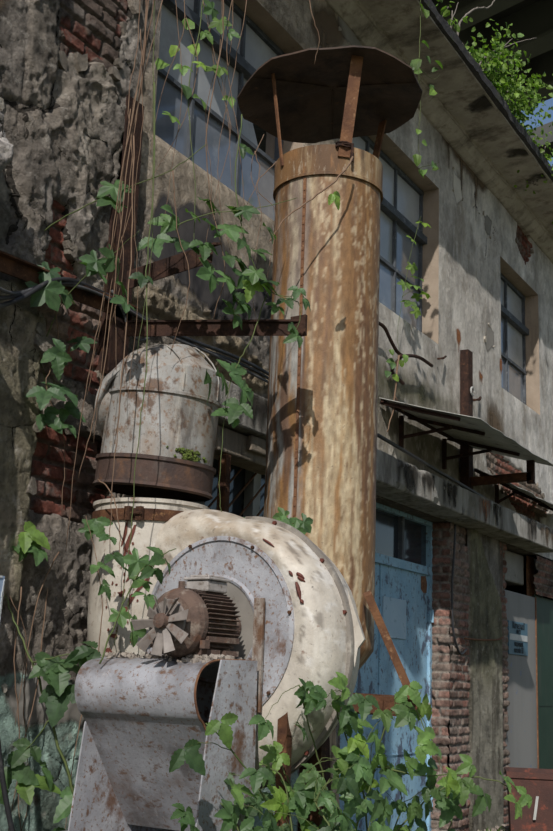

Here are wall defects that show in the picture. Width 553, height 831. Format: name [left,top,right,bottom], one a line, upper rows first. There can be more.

spalling [58,0,142,82]
damp [468,96,493,112]
crack [3,134,122,251]
damp [442,136,487,208]
damp [506,149,529,158]
spalling [515,225,534,265]
spalling [33,294,107,395]
spalling [26,414,111,526]
damp [398,460,457,506]
spalling [486,452,547,523]